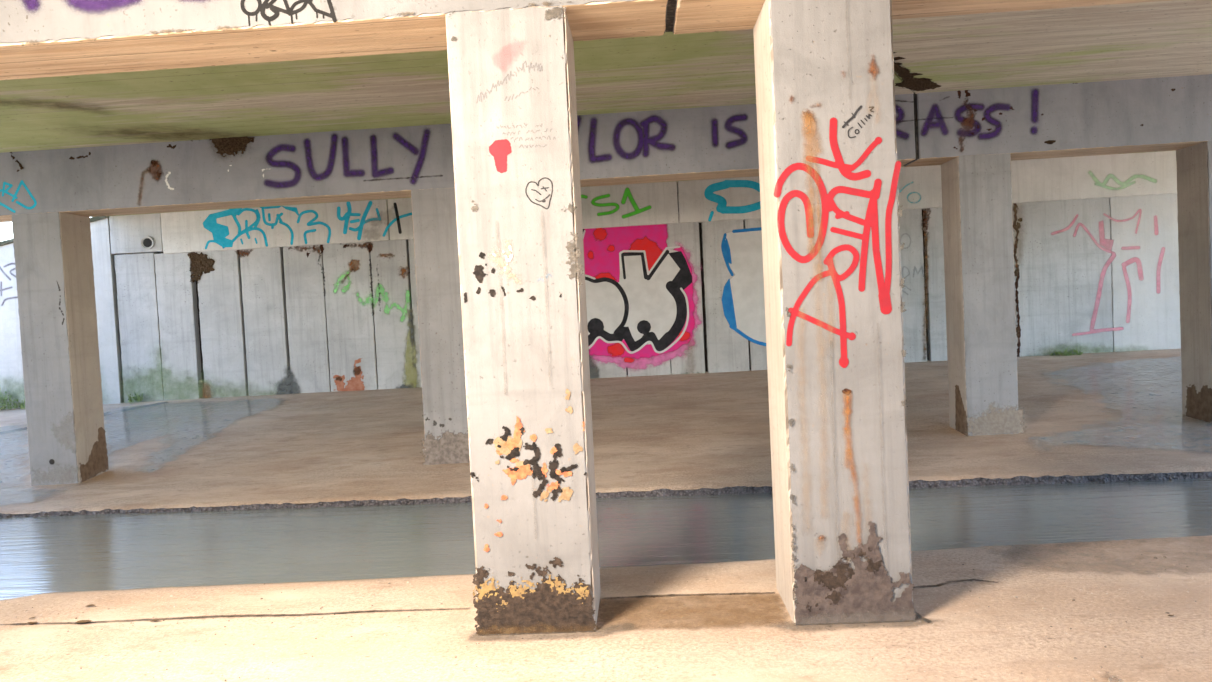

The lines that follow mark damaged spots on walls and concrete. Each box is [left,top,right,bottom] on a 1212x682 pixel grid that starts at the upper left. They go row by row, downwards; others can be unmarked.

spalling [191,136,255,172]
spalling [187,252,215,283]
peeling [422,414,479,482]
peeling [484,389,587,508]
rust [842,388,855,480]
peeling [1185,384,1212,422]
peeling [472,557,596,636]
peeling [791,521,916,626]